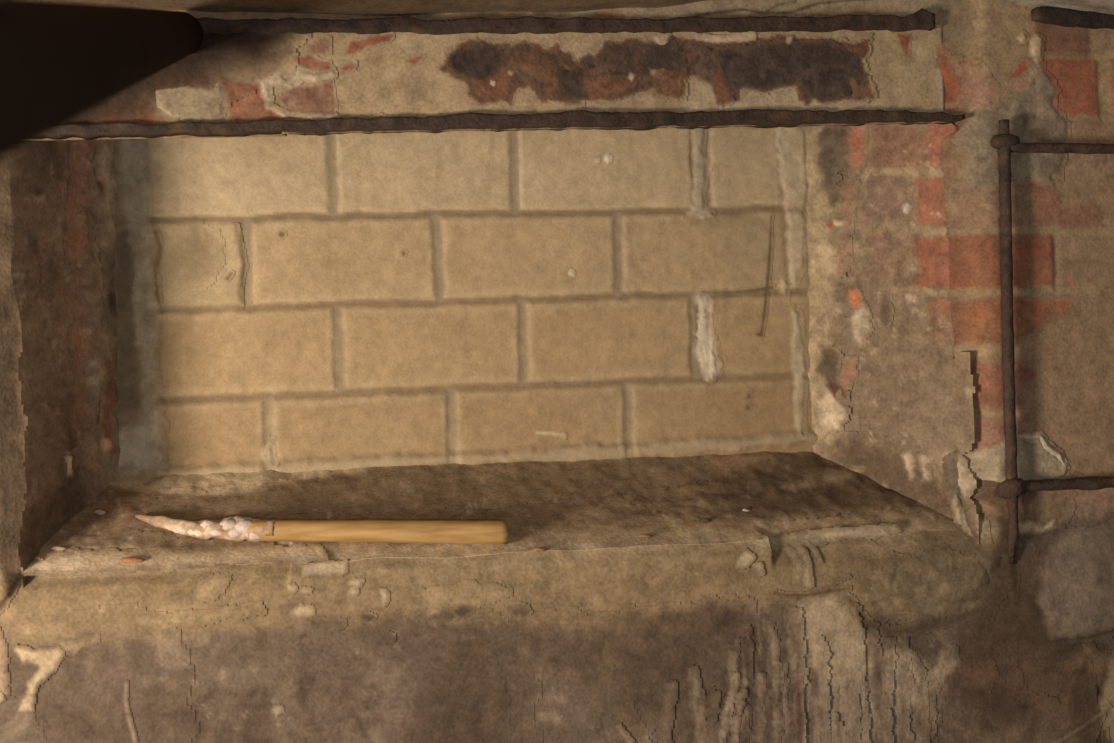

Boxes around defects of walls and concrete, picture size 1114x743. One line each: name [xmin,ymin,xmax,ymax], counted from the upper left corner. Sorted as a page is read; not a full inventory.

rust [437,31,877,109]
rust [586,9,763,19]
rust [793,1,910,17]
peeling [895,32,912,64]
spalling [934,44,1028,114]
spalling [899,200,913,216]
spalling [809,124,895,436]
water stain [11,349,365,743]
water stain [371,351,1111,743]
rust [970,479,1037,554]
crack [0,557,43,614]